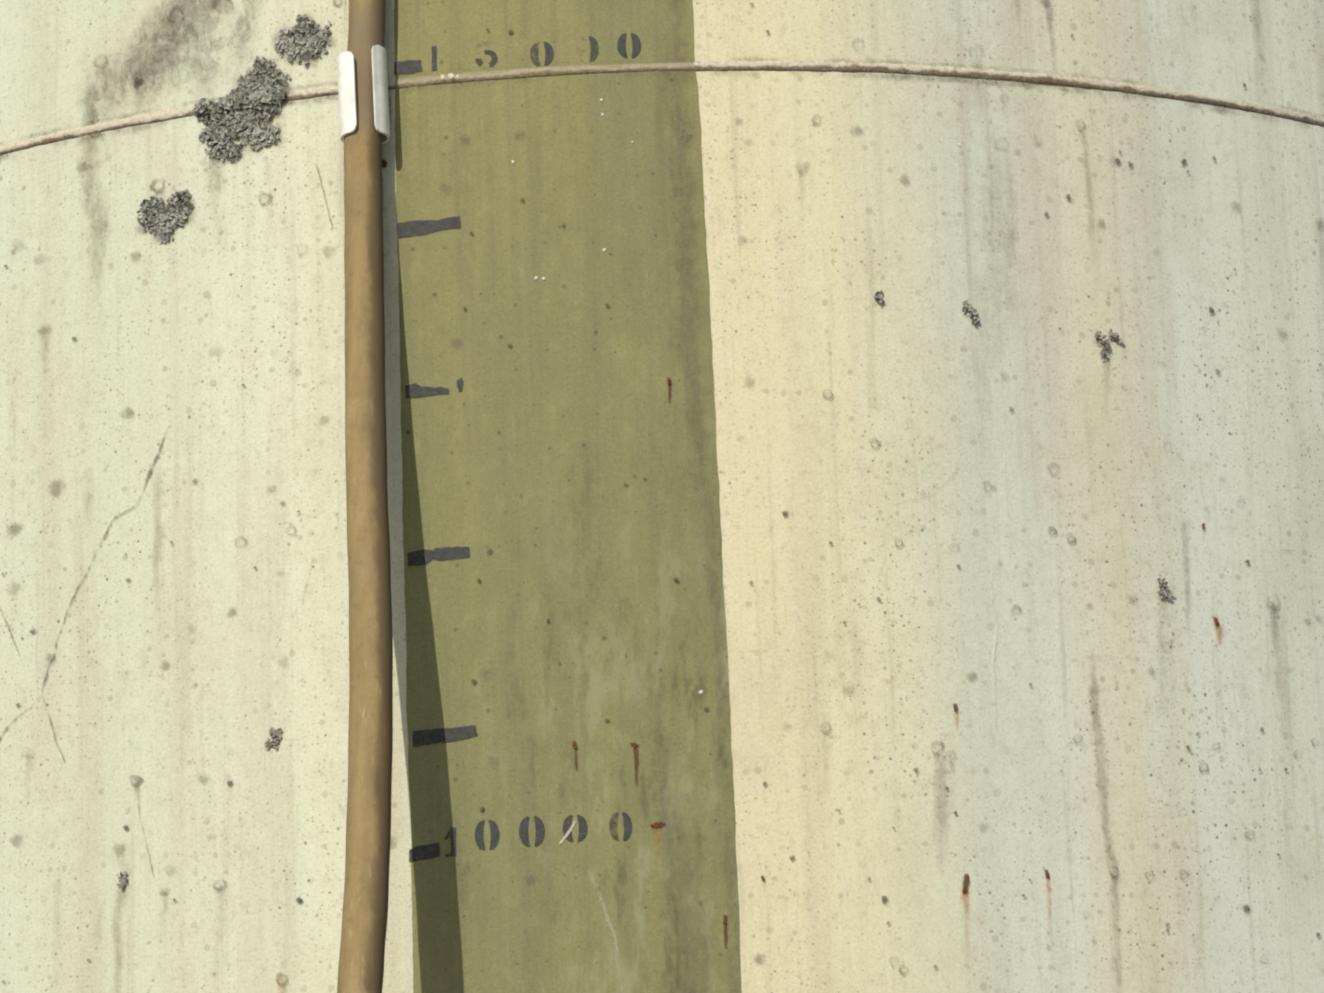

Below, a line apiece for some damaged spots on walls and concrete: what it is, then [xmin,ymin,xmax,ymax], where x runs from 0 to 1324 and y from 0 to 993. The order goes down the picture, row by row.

crack [104,433,166,538]
corrosion [630,742,639,783]
corrosion [962,874,970,906]